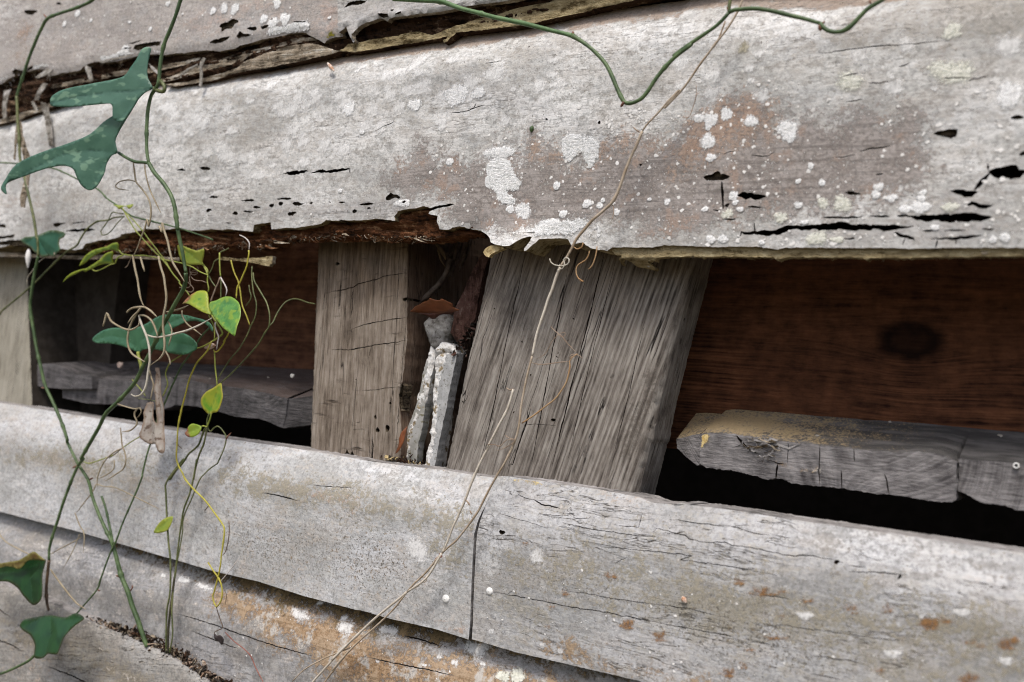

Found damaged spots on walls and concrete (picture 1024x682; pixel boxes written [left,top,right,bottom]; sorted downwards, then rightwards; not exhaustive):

peeling [2,89,11,119]
peeling [31,68,54,146]
peeling [85,54,133,83]
peeling [179,57,206,87]
peeling [379,88,947,244]
crack [714,163,1024,247]
crack [488,253,905,600]